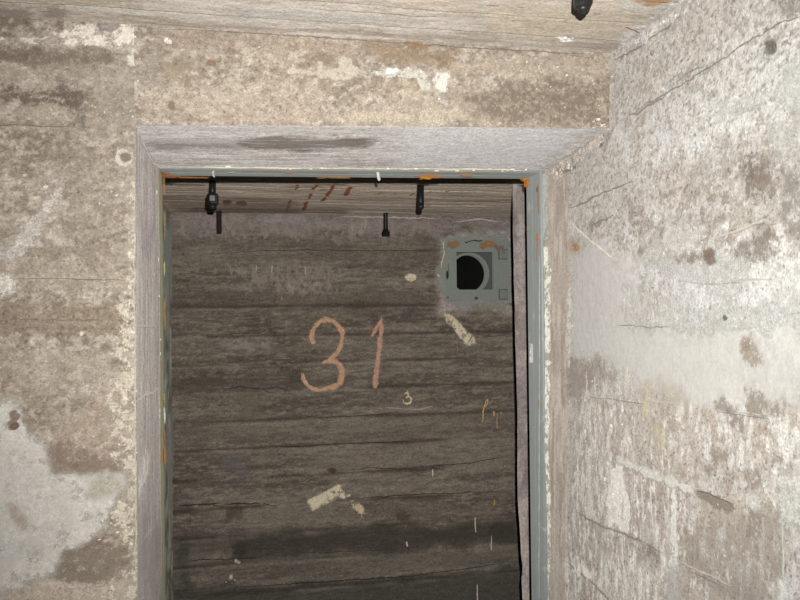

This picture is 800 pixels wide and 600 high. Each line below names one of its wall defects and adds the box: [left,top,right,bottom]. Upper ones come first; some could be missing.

crack [628,16,800,116]
crack [568,181,633,263]
water stain [48,440,123,472]
crack [578,512,663,561]
water stain [56,543,133,583]
crack [680,562,731,586]